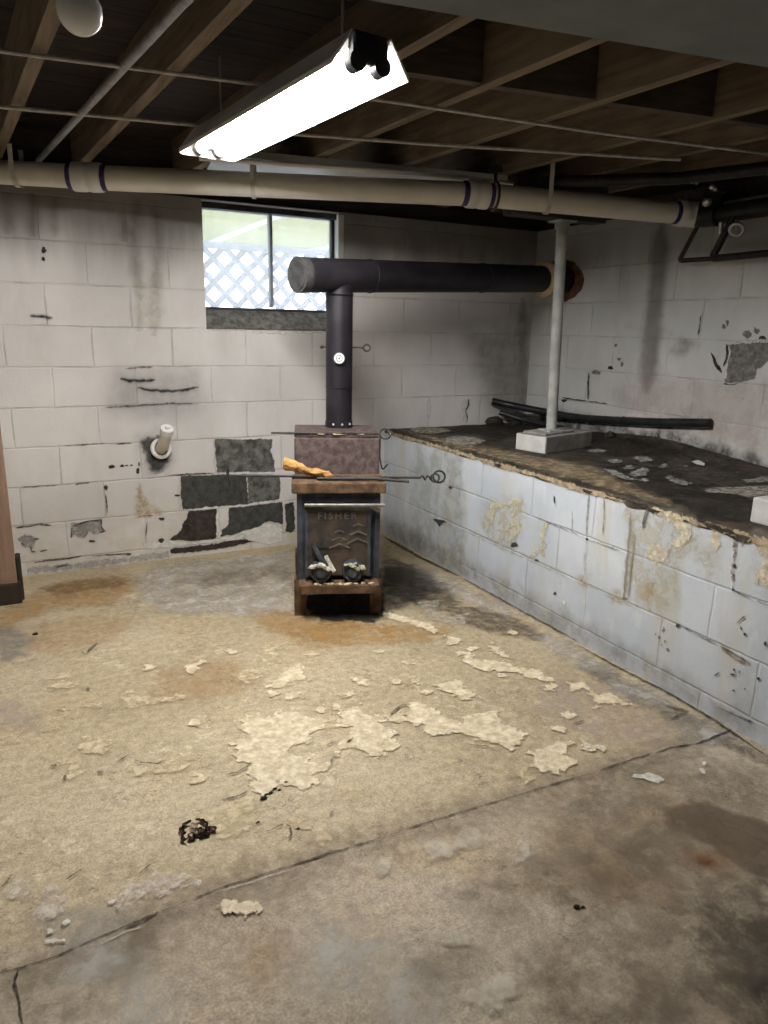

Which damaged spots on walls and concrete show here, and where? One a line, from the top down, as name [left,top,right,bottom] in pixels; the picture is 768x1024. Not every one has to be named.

peeling [711,327,768,385]
peeling [71,485,108,538]
peeling [159,438,295,554]
spalling [387,428,768,589]
crack [224,765,248,800]
peeling [198,645,607,846]
crack [409,707,753,828]
peeling [632,772,664,783]
crack [0,839,375,1024]
peeling [215,898,263,922]